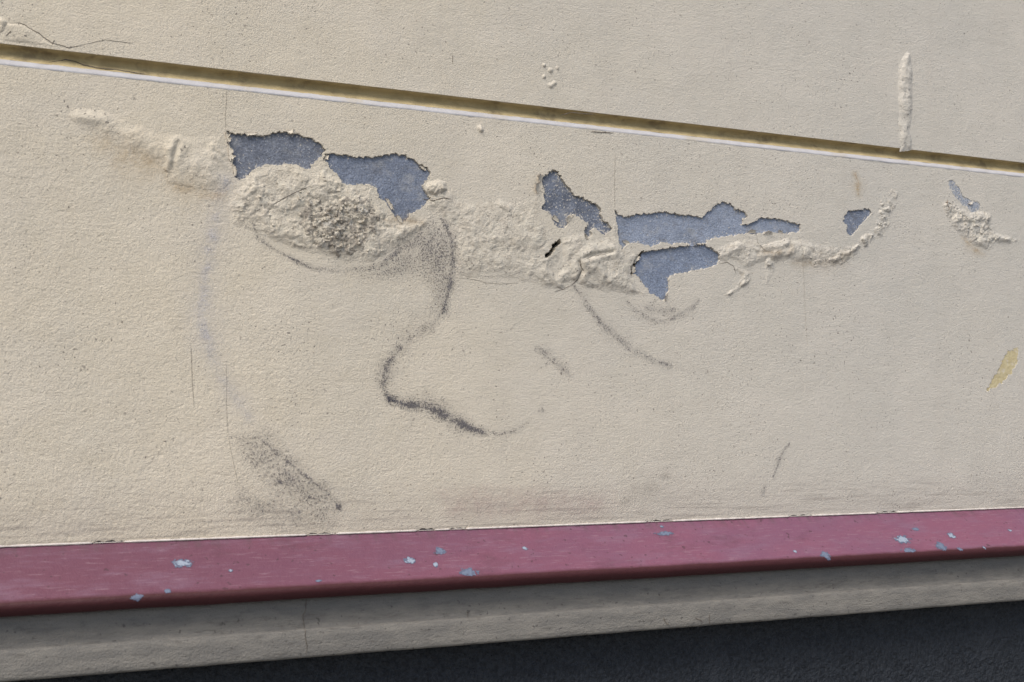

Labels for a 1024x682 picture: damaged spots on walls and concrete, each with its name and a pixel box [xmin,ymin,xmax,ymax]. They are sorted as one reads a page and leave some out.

crack [6,23,149,75]
peeling [225,129,430,258]
peeling [535,170,800,302]
peeling [843,208,871,236]
peeling [947,180,980,212]